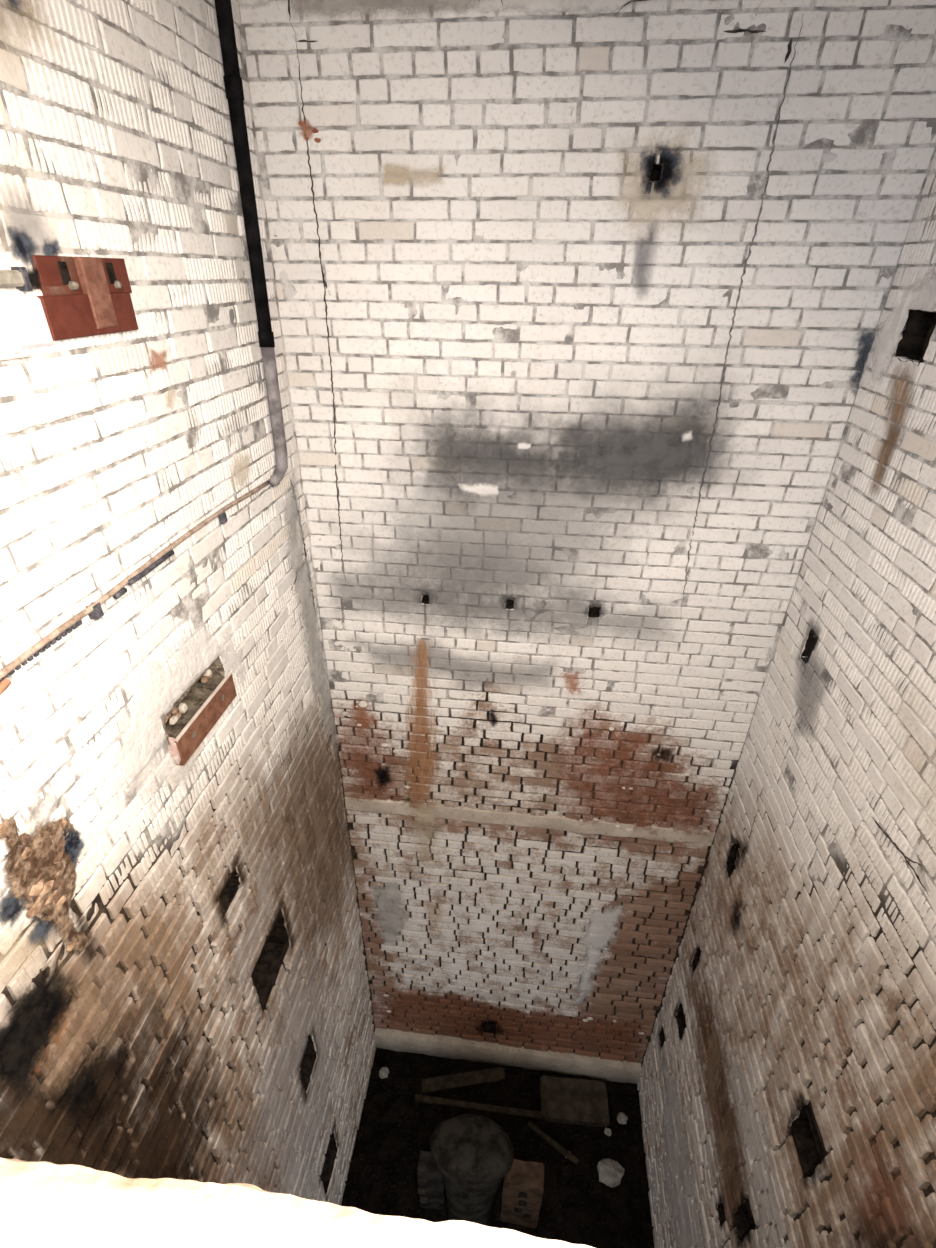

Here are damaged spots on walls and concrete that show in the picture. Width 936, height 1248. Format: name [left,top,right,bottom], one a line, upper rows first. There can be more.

crack [288,0,348,592]
crack [680,16,803,620]
rust [872,372,910,491]
crack [291,479,316,613]
rust [410,646,433,809]
spalling [0,816,96,959]
leakage [0,972,219,1182]